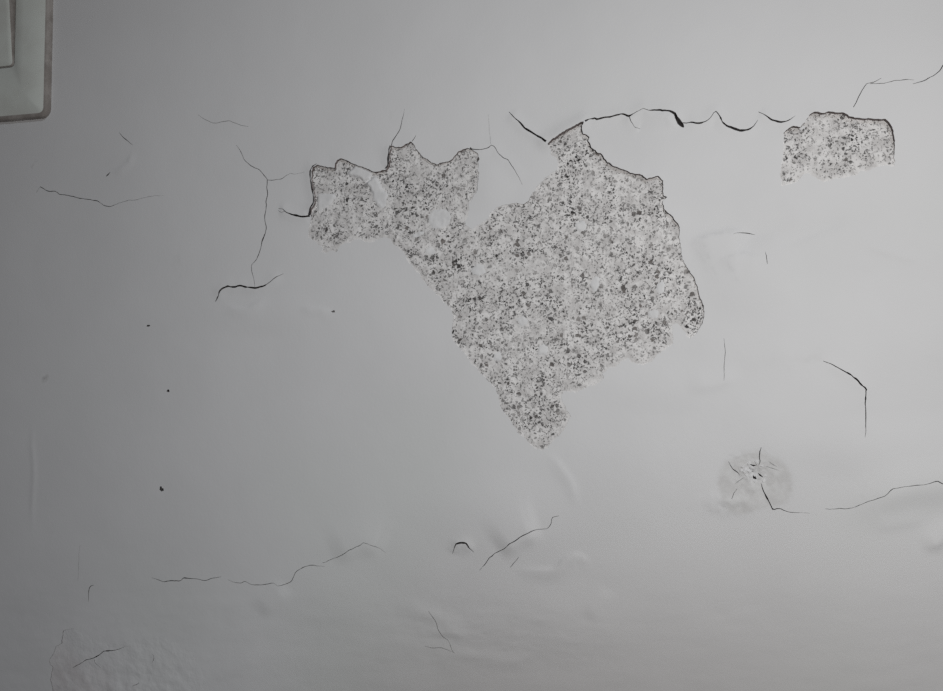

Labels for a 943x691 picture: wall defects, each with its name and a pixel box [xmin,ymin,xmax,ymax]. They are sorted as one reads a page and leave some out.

crack [853,65,943,107]
crack [471,112,547,179]
crack [585,108,795,134]
spalling [780,111,895,186]
crack [36,187,151,207]
crack [199,115,316,300]
spalling [308,121,704,451]
crack [824,361,867,435]
crack [837,481,943,509]
crack [452,516,557,565]
peeling [49,628,206,691]